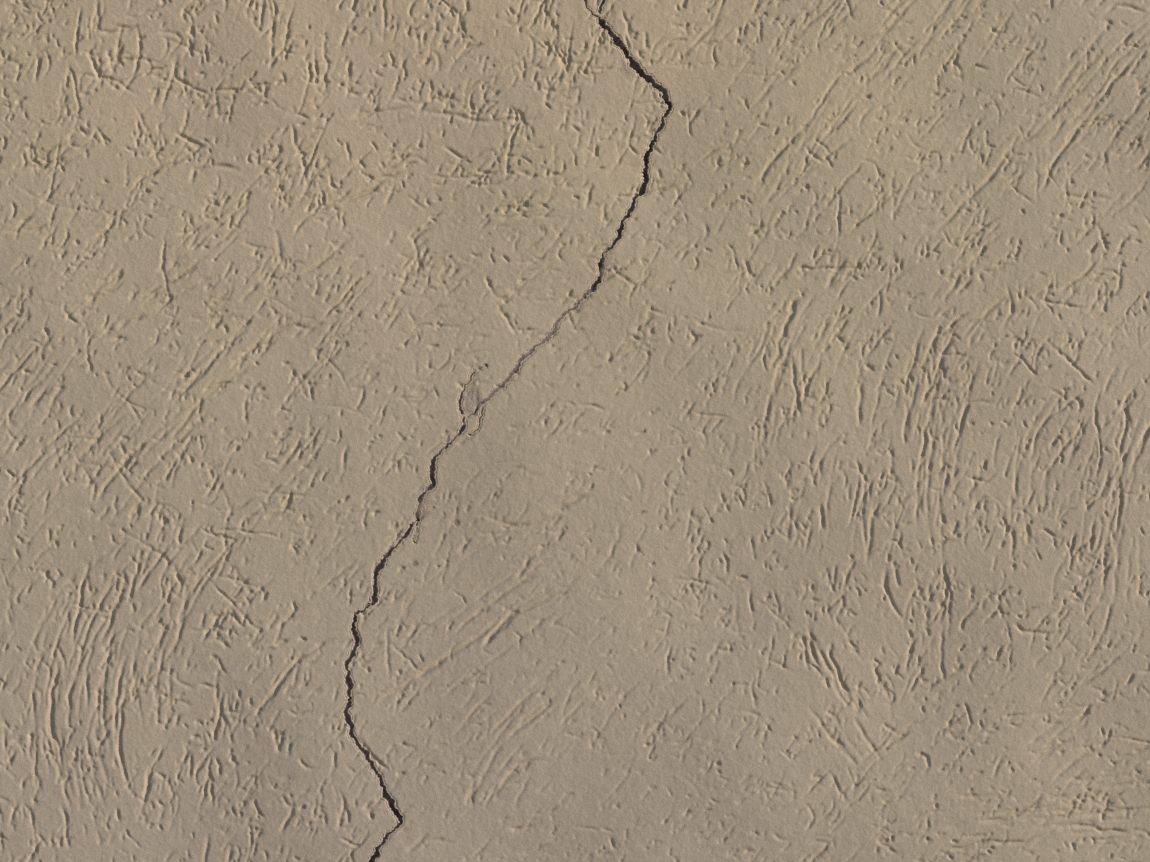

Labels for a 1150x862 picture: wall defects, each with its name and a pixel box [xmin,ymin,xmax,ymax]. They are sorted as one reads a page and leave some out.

crack [341,0,674,862]